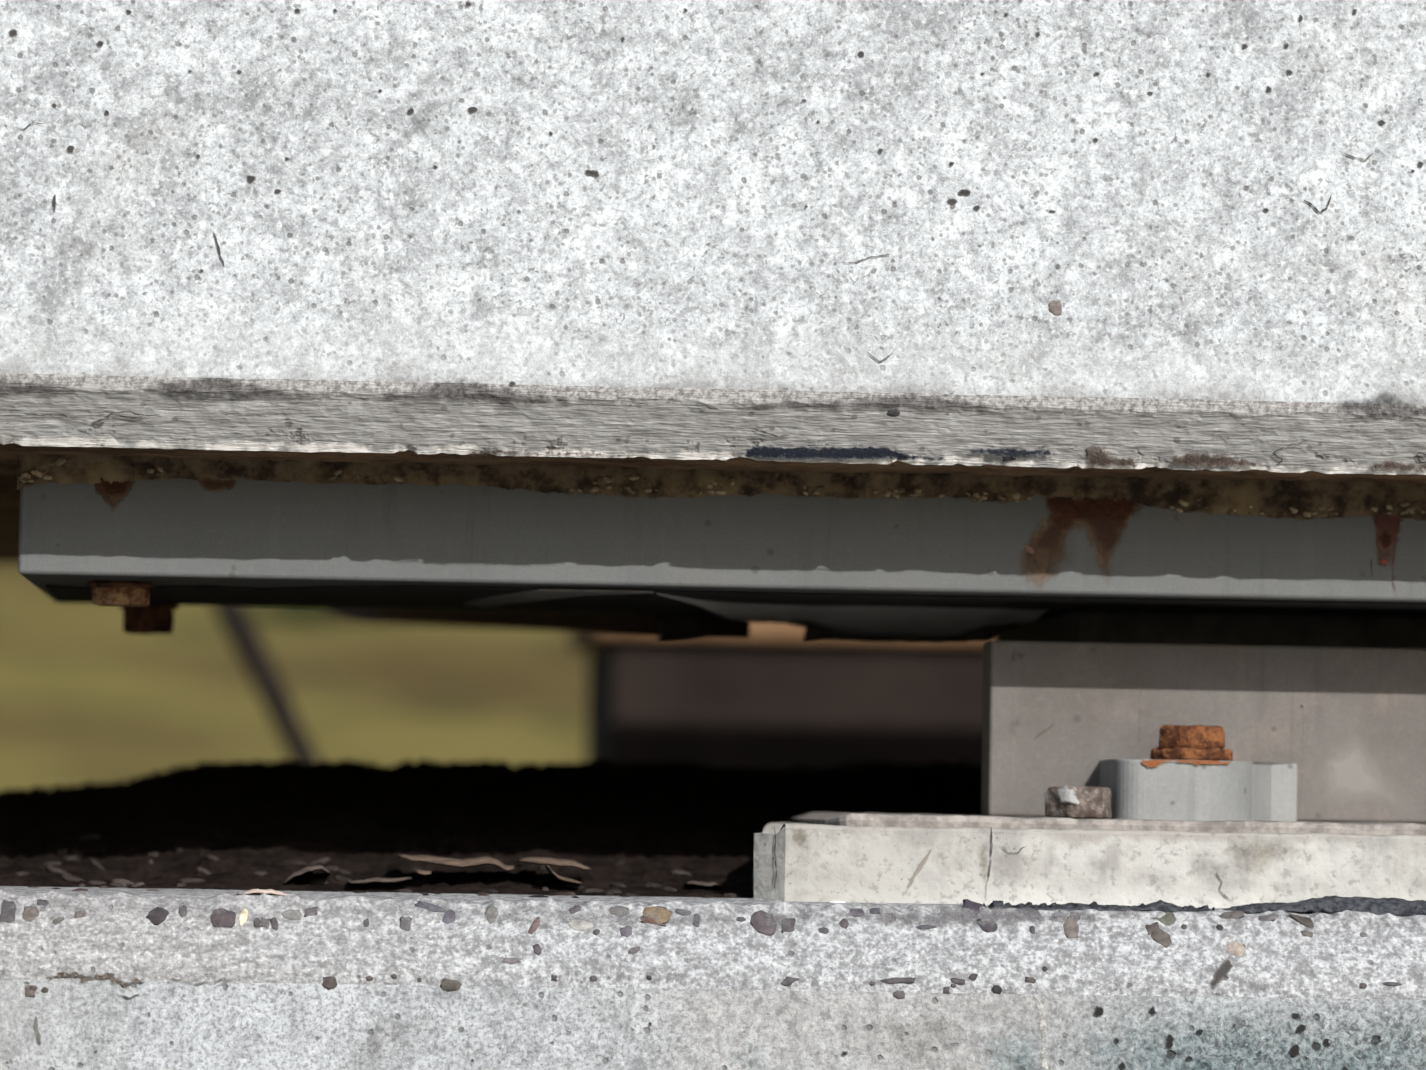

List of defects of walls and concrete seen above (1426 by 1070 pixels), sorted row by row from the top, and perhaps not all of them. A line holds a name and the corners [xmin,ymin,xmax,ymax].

rust [1025,496,1139,580]
rust [1371,513,1403,590]